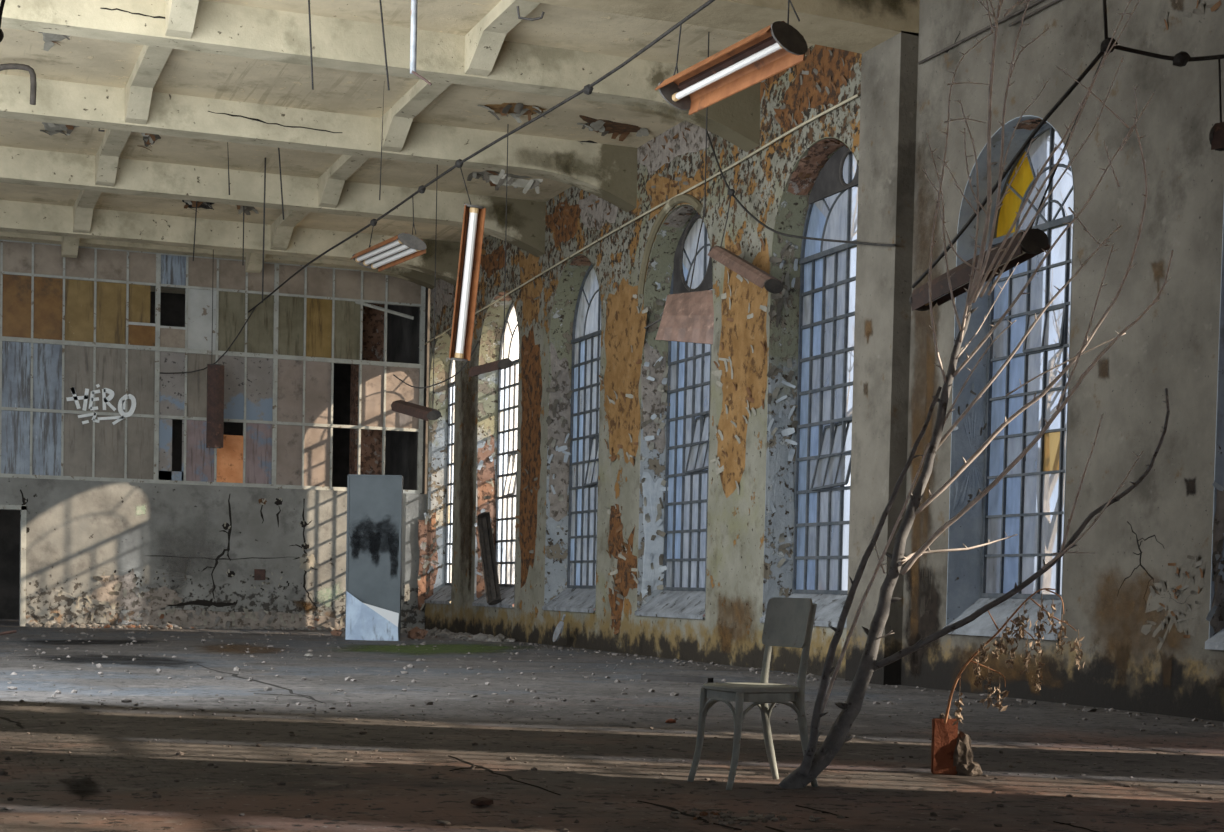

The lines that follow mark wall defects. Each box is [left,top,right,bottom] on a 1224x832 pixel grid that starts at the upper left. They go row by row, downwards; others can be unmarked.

crack [208,111,342,133]
peeling [477,103,546,123]
spalling [467,169,543,194]
peeling [710,235,808,596]
peeling [598,277,671,635]
flaking render [26,565,345,630]
crack [150,494,317,609]
flaking render [226,543,320,594]
leakage [719,599,750,650]
leakage [1098,576,1184,685]